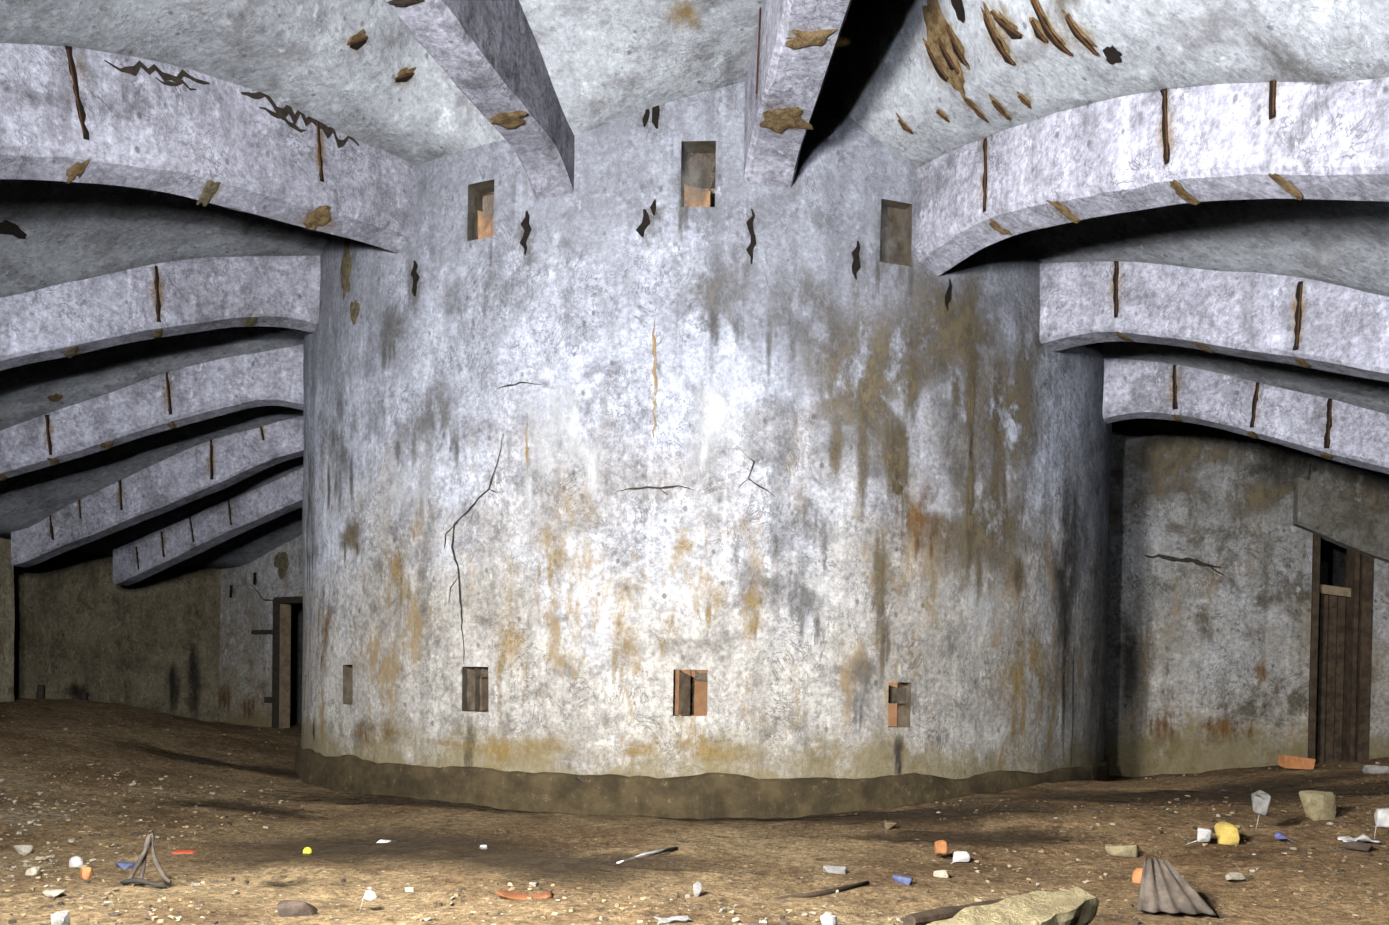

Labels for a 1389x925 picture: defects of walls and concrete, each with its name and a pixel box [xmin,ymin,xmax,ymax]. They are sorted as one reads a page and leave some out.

corrosion [65,46,89,140]
spalling [520,211,531,255]
spalling [636,199,659,237]
spalling [746,209,756,264]
corrosion [982,138,1012,235]
spalling [922,0,1122,123]
corrosion [1160,88,1201,205]
water stain [823,272,1037,634]
crack [444,434,504,662]
crack [1144,554,1226,577]
water stain [854,548,890,719]
water stain [1057,512,1077,754]